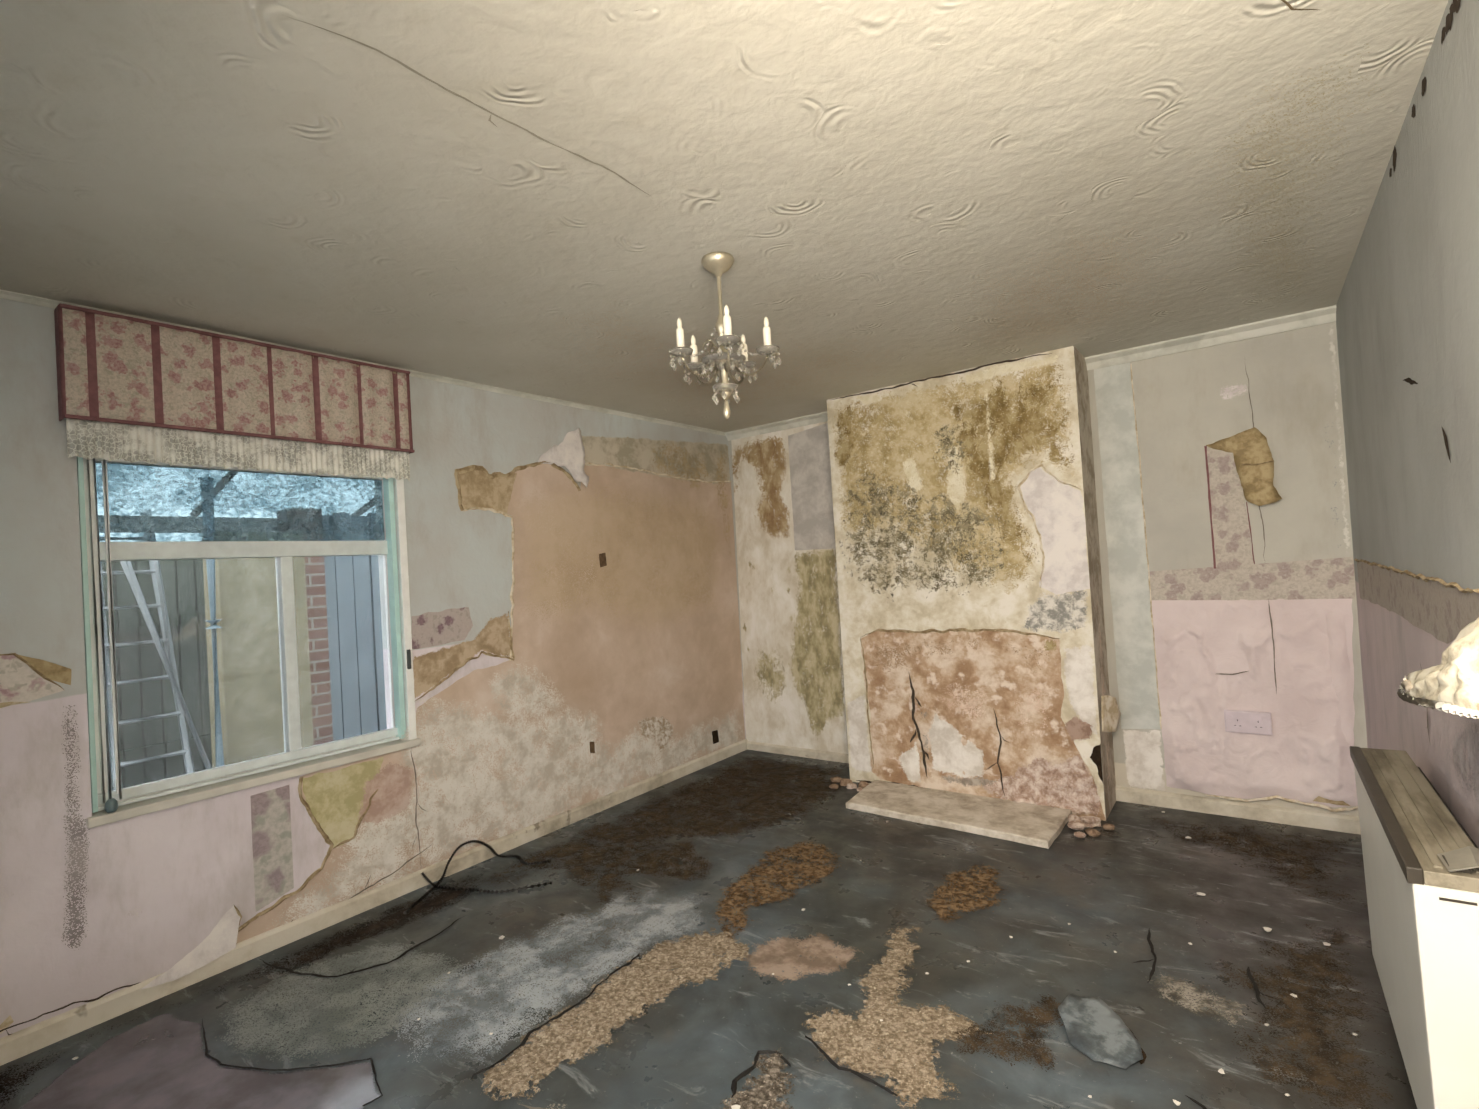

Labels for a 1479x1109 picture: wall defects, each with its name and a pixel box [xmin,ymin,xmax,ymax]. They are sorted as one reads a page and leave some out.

crack [1281,0,1318,10]
crack [286,16,651,196]
leakage [543,300,1079,740]
flaking render [237,428,745,943]
flaking render [847,628,1106,821]
crack [986,711,1006,796]